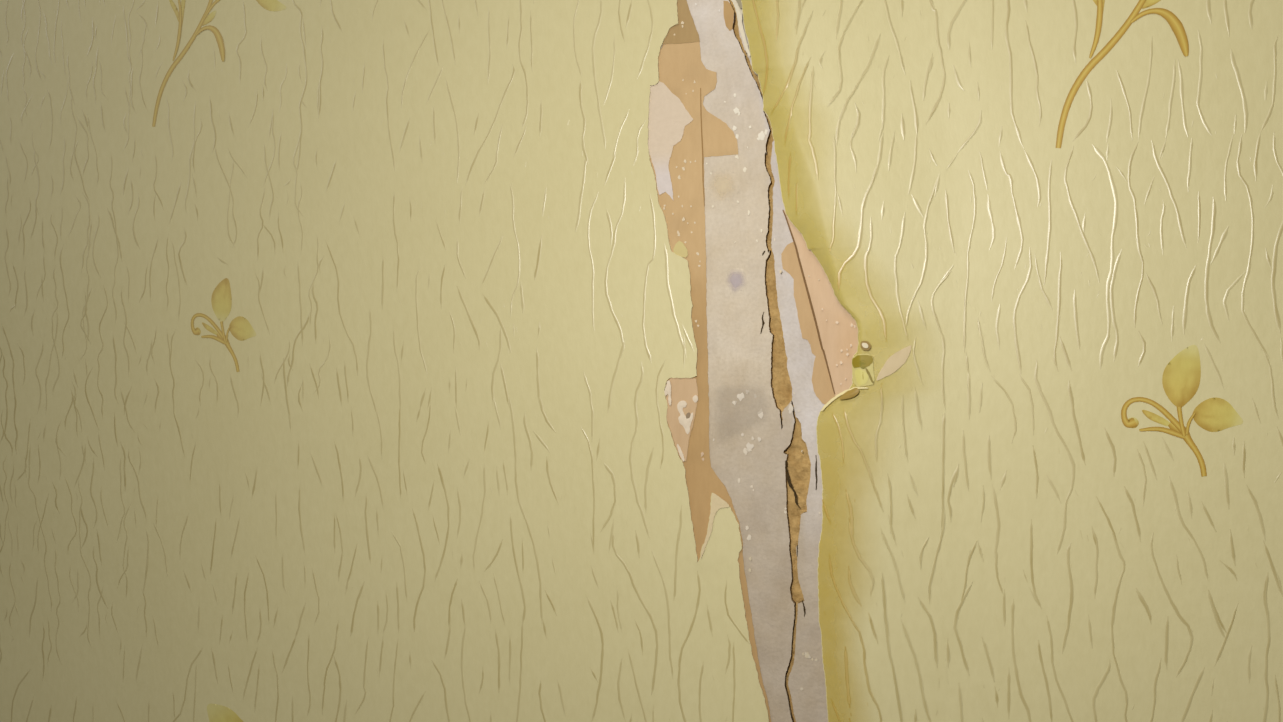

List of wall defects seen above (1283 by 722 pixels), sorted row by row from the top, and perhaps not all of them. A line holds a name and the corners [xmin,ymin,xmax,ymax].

flaking render [687,0,828,722]
crack [729,0,817,722]
damp [741,0,876,354]
damp [818,386,862,722]